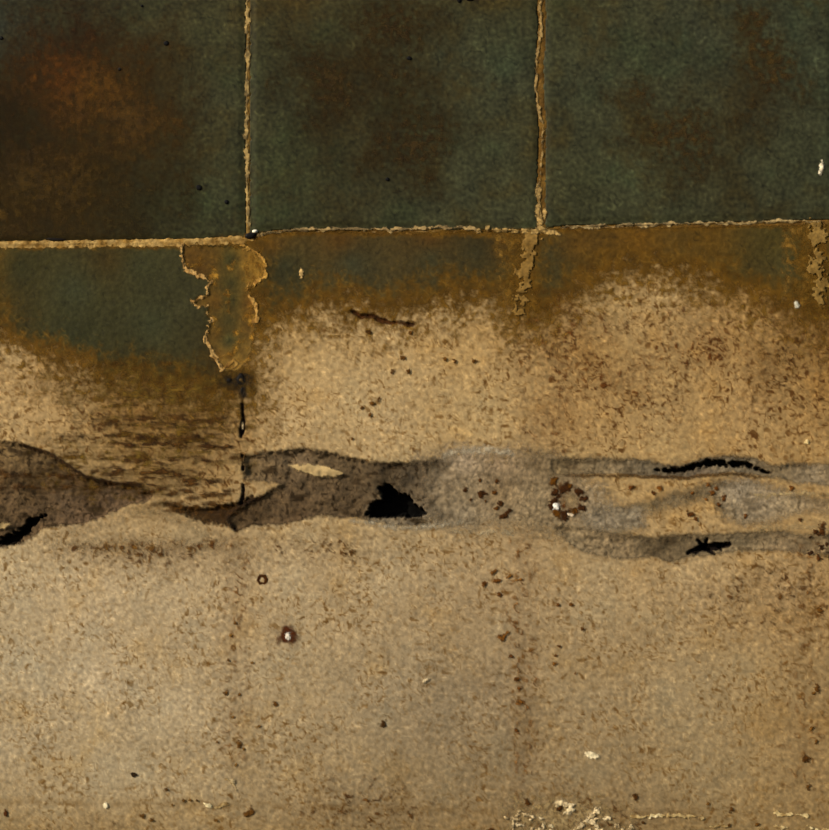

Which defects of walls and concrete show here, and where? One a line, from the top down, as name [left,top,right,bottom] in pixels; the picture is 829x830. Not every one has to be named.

peeling [180,0,820,398]
crack [351,310,415,327]
rust [542,323,612,390]
rust [655,333,726,369]
rust [747,334,814,405]
water stain [91,414,233,514]
crack [238,403,246,505]
spalling [163,447,510,531]
spalling [551,456,829,495]
crack [655,459,770,474]
crack [687,538,731,555]
water stain [502,793,634,830]